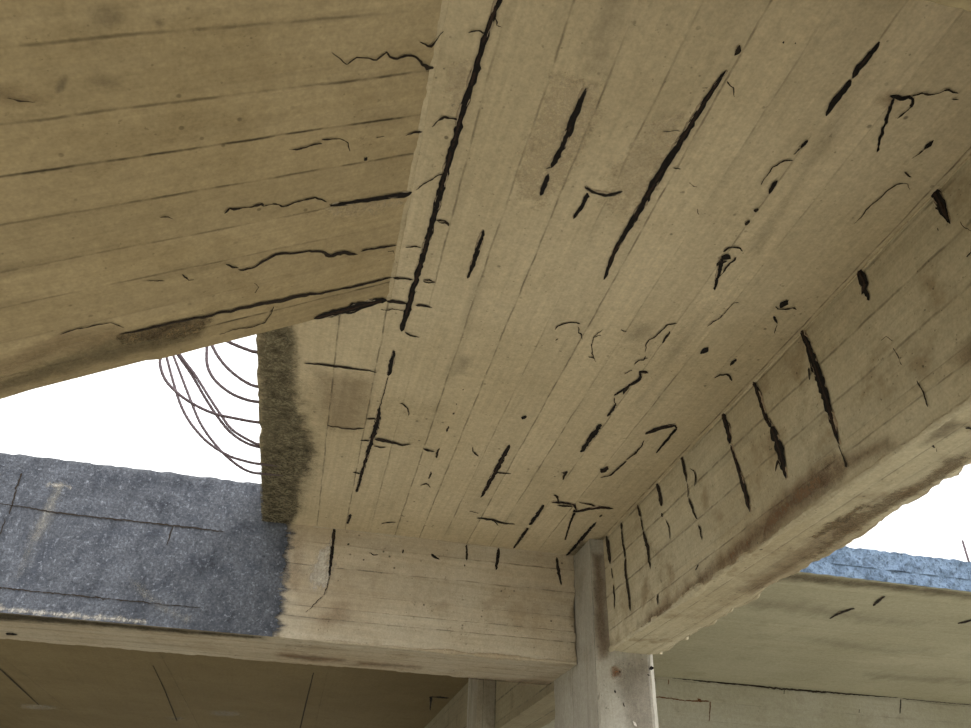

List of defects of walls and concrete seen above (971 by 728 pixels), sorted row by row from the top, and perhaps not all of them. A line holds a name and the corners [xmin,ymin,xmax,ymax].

crack [333,31,444,70]
crack [289,138,350,151]
crack [224,197,326,214]
crack [680,457,702,539]
crack [606,484,670,610]
water stain [682,463,844,594]
water stain [784,567,971,596]